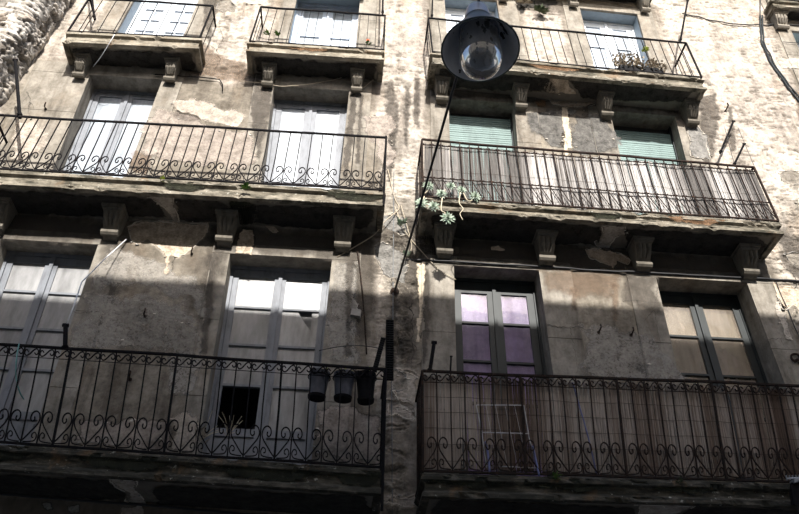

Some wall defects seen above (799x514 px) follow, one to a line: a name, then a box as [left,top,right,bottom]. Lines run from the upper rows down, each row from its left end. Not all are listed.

damp [72,0,377,157]
damp [343,94,363,177]
damp [385,78,420,181]
flaking render [127,197,209,274]
flaking render [585,225,631,269]
peeling [773,282,799,340]